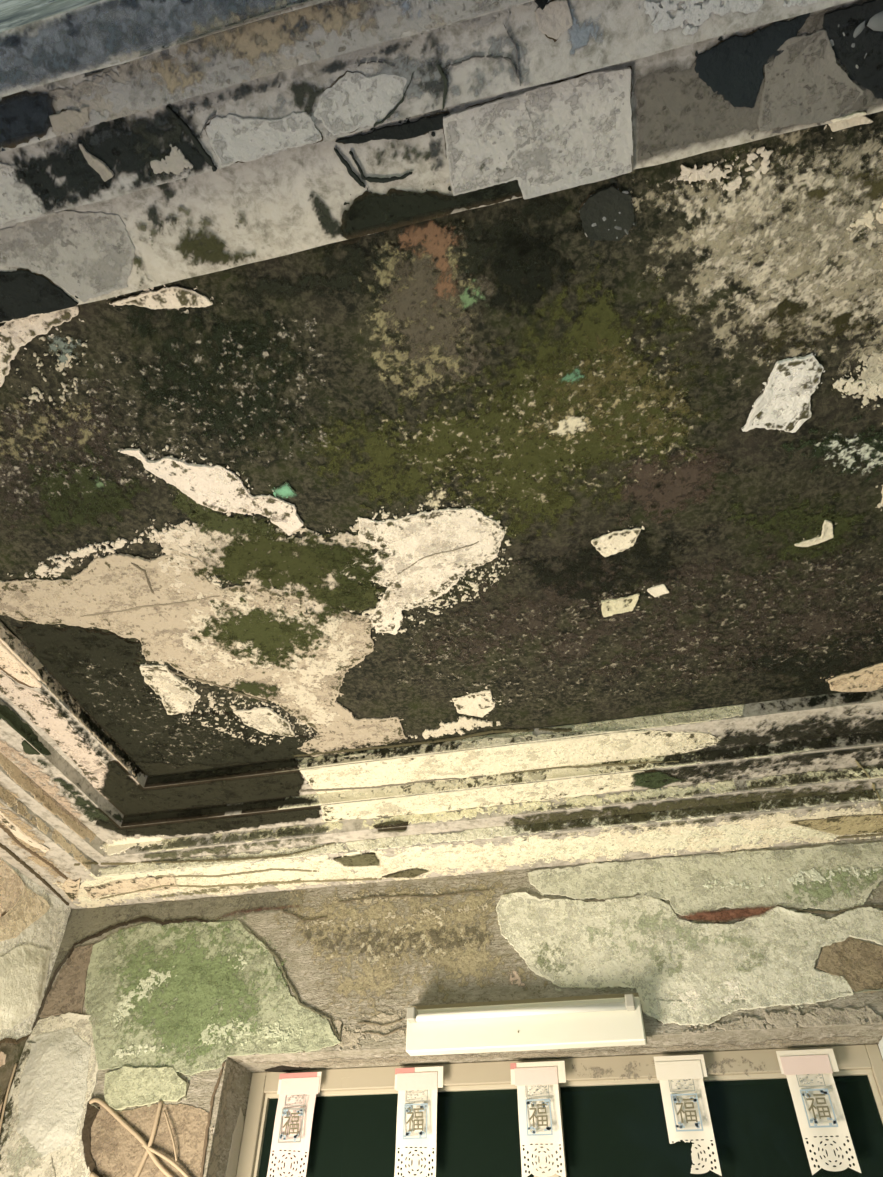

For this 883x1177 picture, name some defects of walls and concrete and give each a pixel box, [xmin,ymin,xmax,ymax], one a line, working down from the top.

crack [334,147,412,194]
spalling [336,113,449,144]
crack [357,25,535,140]
flaking render [633,0,883,162]
spalling [0,270,78,322]
mould [0,180,587,538]
mould [737,289,875,362]
damp [412,446,883,841]
damp [3,623,461,861]
peeling [302,842,883,1026]
crack [776,905,883,915]
spalling [0,875,303,1177]